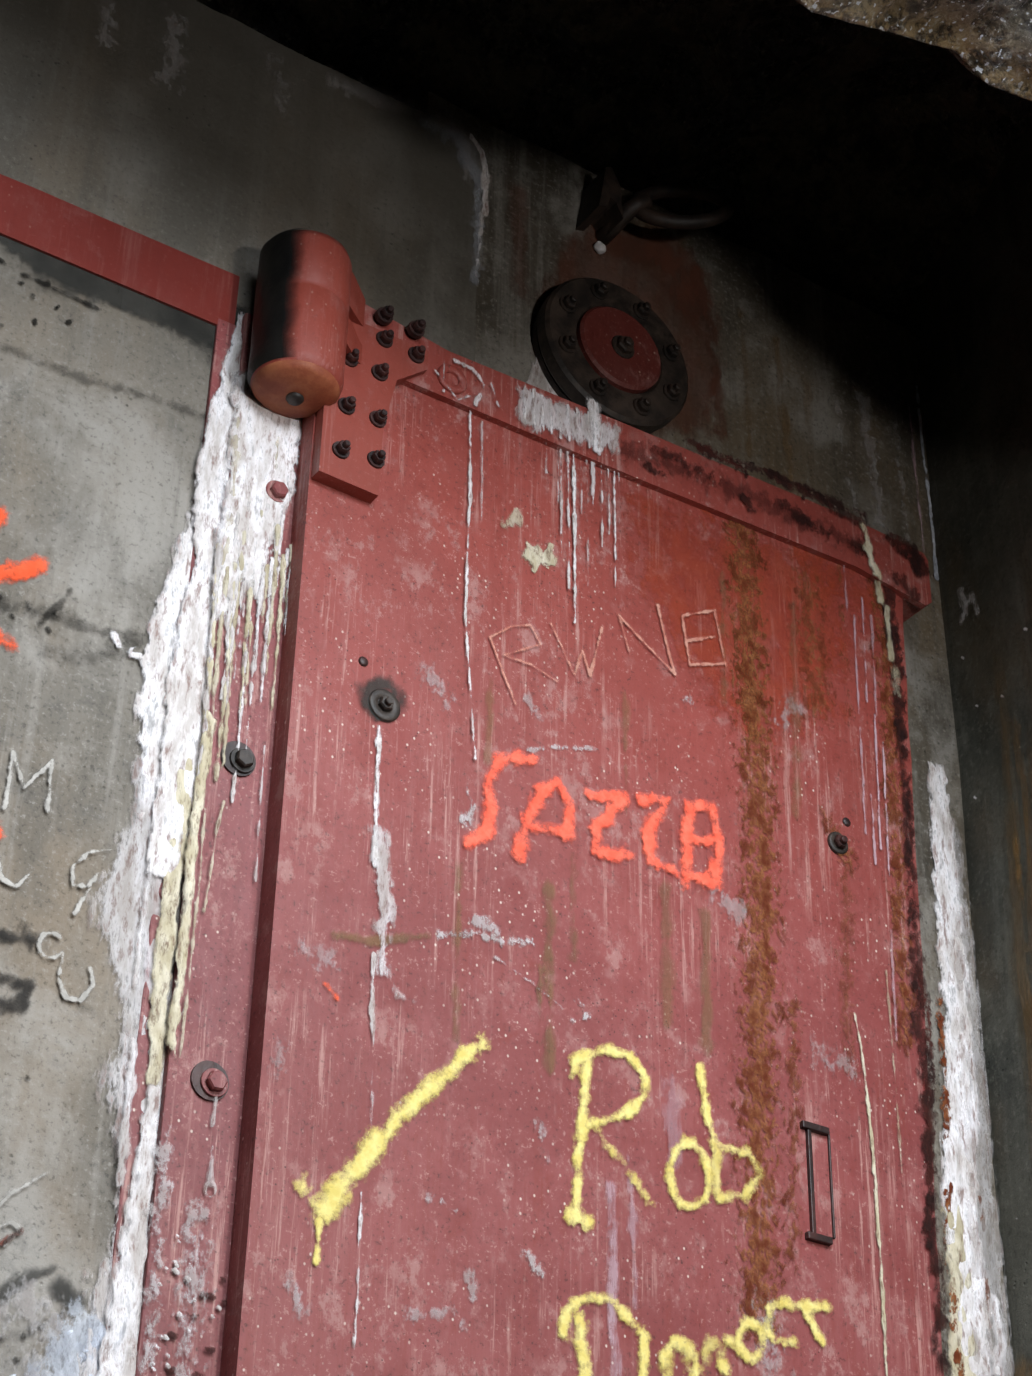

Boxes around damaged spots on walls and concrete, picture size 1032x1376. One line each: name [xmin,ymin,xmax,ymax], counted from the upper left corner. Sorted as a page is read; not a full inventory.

leakage [0,235,303,1376]
rust [722,520,804,1347]
peeling [682,438,867,554]
rust [868,578,922,1055]
peeling [881,530,951,1372]
leakage [927,761,1006,1376]